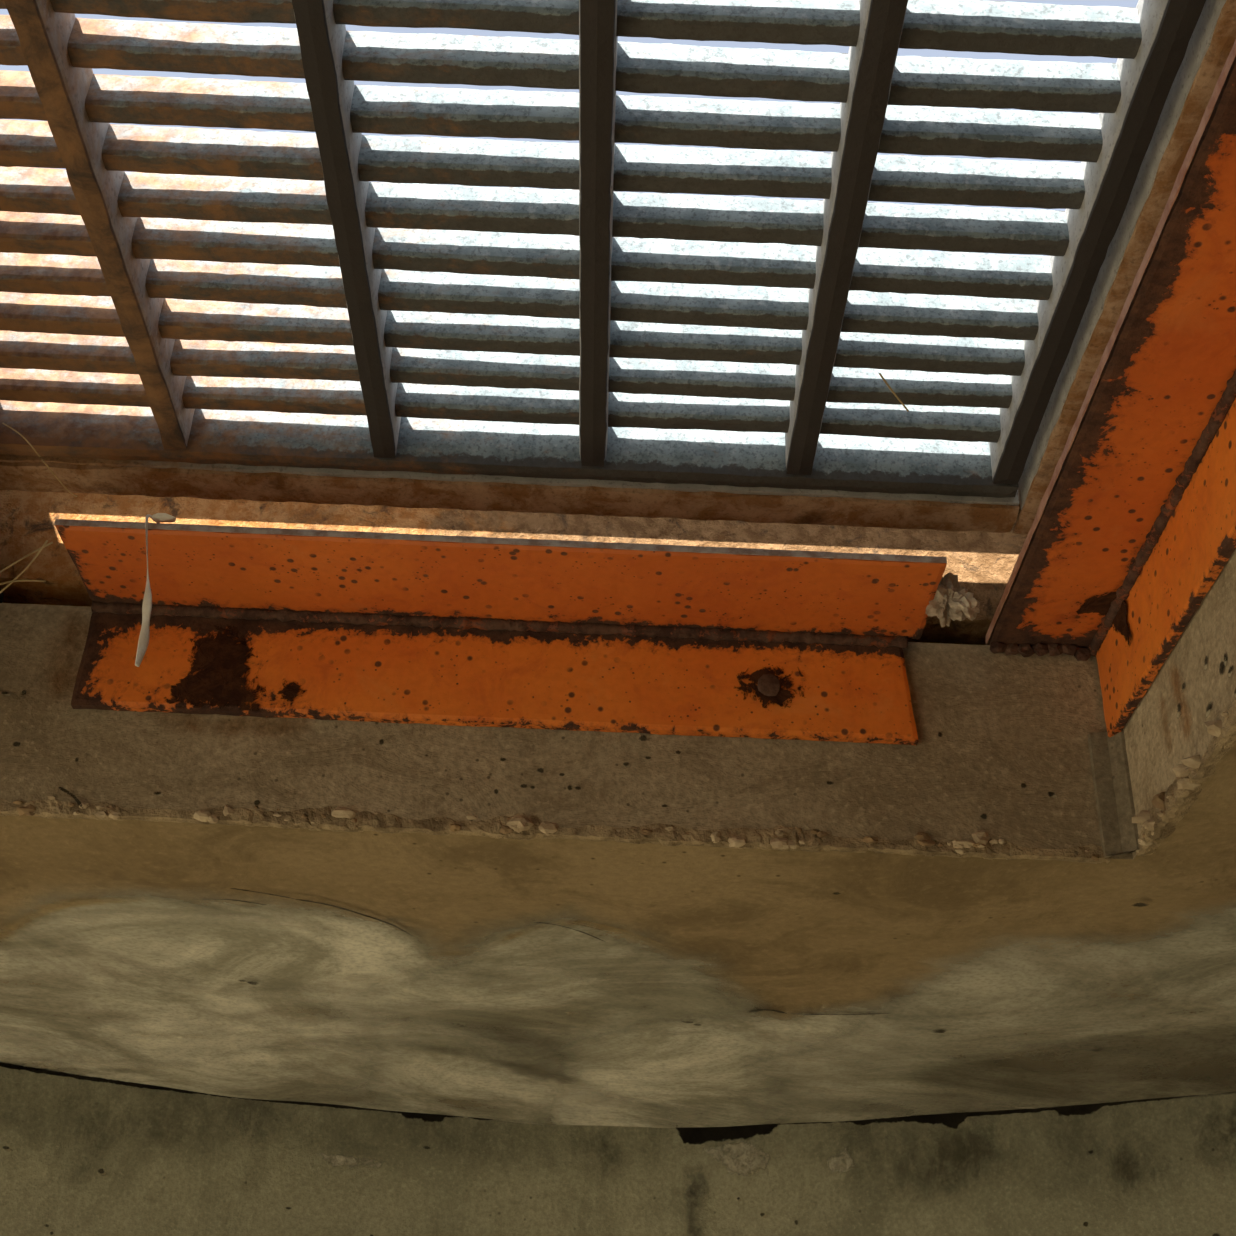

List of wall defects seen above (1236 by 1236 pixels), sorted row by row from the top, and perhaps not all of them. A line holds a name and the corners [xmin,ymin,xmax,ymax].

corrosion [1076,592,1132,647]
corrosion [165,626,307,711]
corrosion [734,667,805,708]